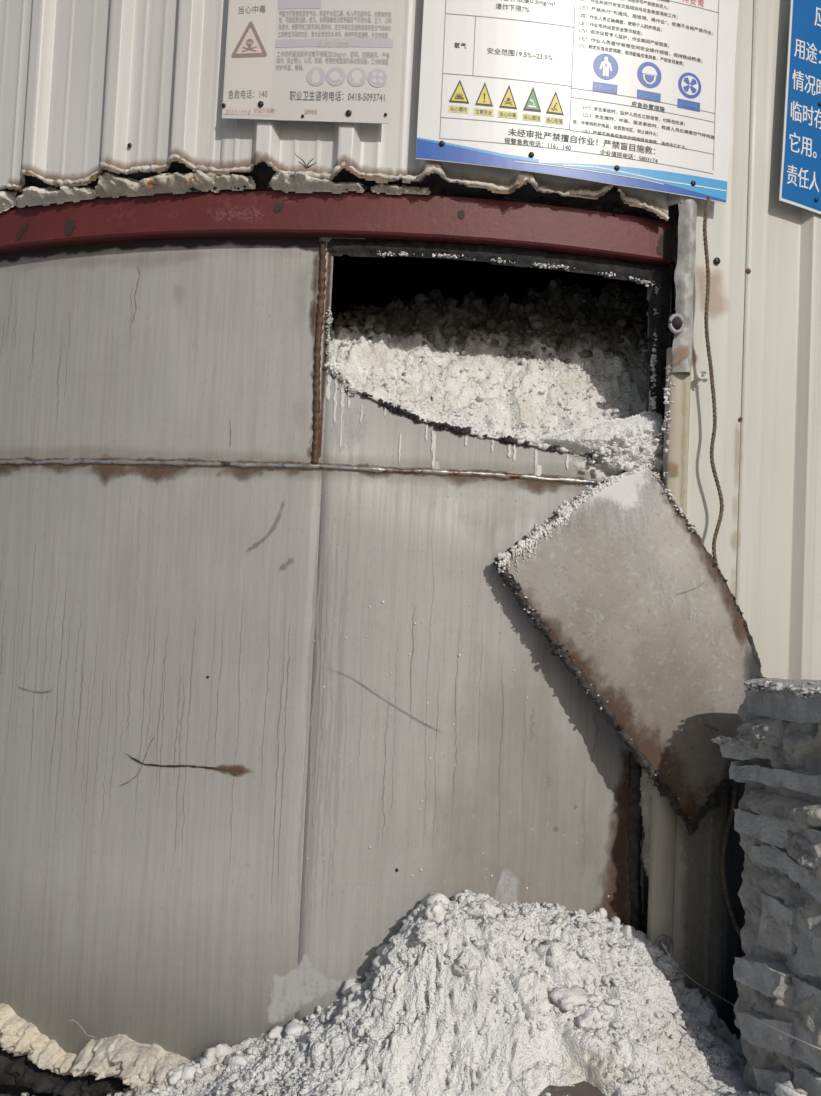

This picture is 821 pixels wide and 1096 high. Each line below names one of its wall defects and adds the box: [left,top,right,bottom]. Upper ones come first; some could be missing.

peeling [171,176,273,196]
rust [310,256,318,336]
damp [326,367,363,449]
damp [425,425,440,469]
damp [94,464,184,480]
damp [231,467,262,478]
crack [119,738,248,786]
rust [603,755,632,926]